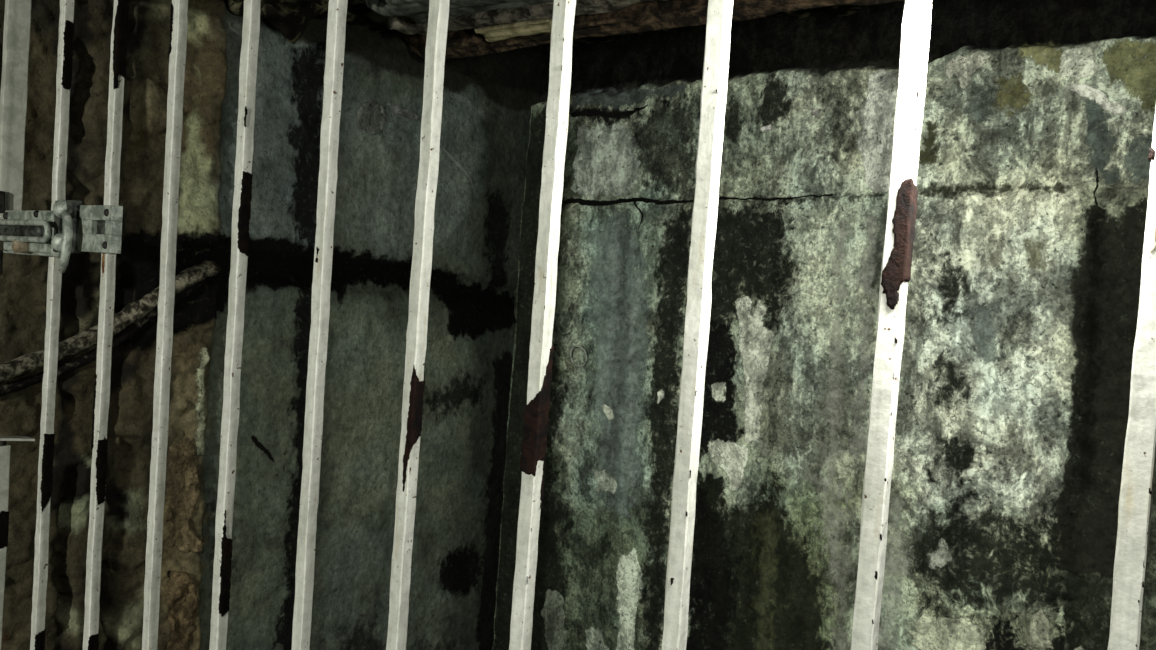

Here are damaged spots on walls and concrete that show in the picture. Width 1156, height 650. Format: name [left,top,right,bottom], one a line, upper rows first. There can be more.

water stain [724,70,792,142]
water stain [918,121,940,166]
water stain [1082,92,1152,187]
crack [561,192,883,229]
crack [918,180,1065,199]
water stain [686,191,835,650]
water stain [878,198,1148,650]